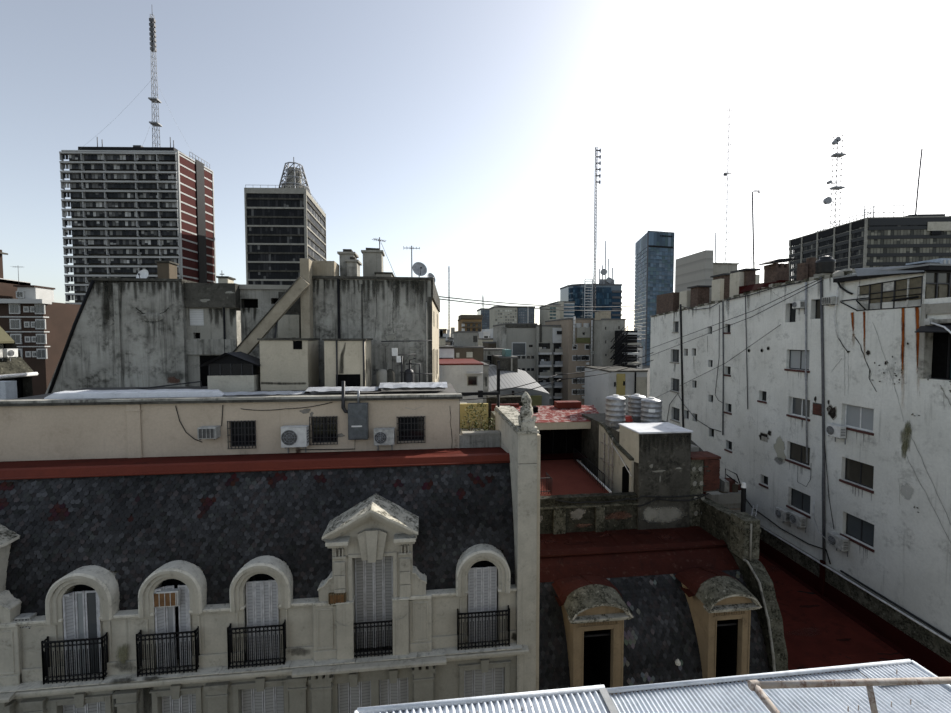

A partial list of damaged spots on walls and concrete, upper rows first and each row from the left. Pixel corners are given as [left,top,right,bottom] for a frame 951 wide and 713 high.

leakage [90,280,185,324]
leakage [312,279,427,302]
corrosion [901,307,920,372]
crack [832,324,951,543]